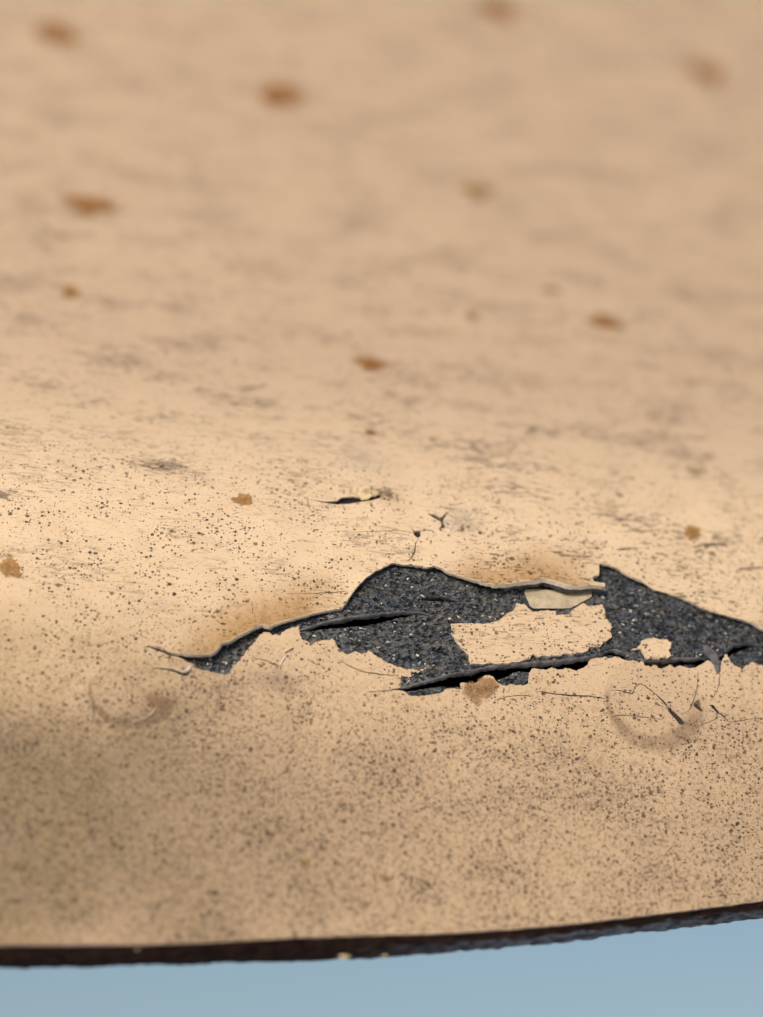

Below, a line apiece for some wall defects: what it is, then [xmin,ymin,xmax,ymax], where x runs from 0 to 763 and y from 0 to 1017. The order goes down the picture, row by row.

corrosion [36,22,77,44]
corrosion [261,84,305,108]
corrosion [65,196,113,215]
corrosion [590,315,618,329]
corrosion [357,358,387,370]
corrosion [232,493,252,505]
corrosion [685,525,702,540]
corrosion [0,554,21,578]
peeling [152,564,763,696]
corrosion [466,678,497,703]